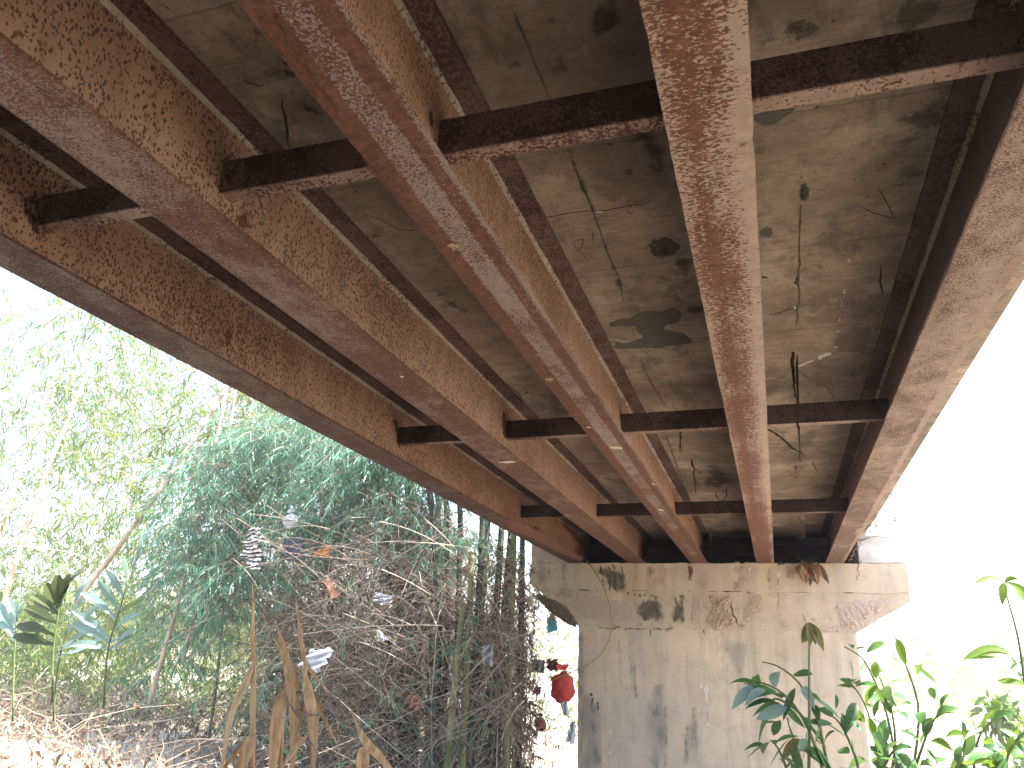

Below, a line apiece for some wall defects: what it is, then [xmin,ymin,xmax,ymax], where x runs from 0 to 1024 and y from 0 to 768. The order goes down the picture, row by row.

crack [546,202,648,217]
crack [862,188,895,219]
crack [771,205,801,326]
damp [610,307,701,349]
spalling [706,593,763,632]
spalling [819,599,891,633]